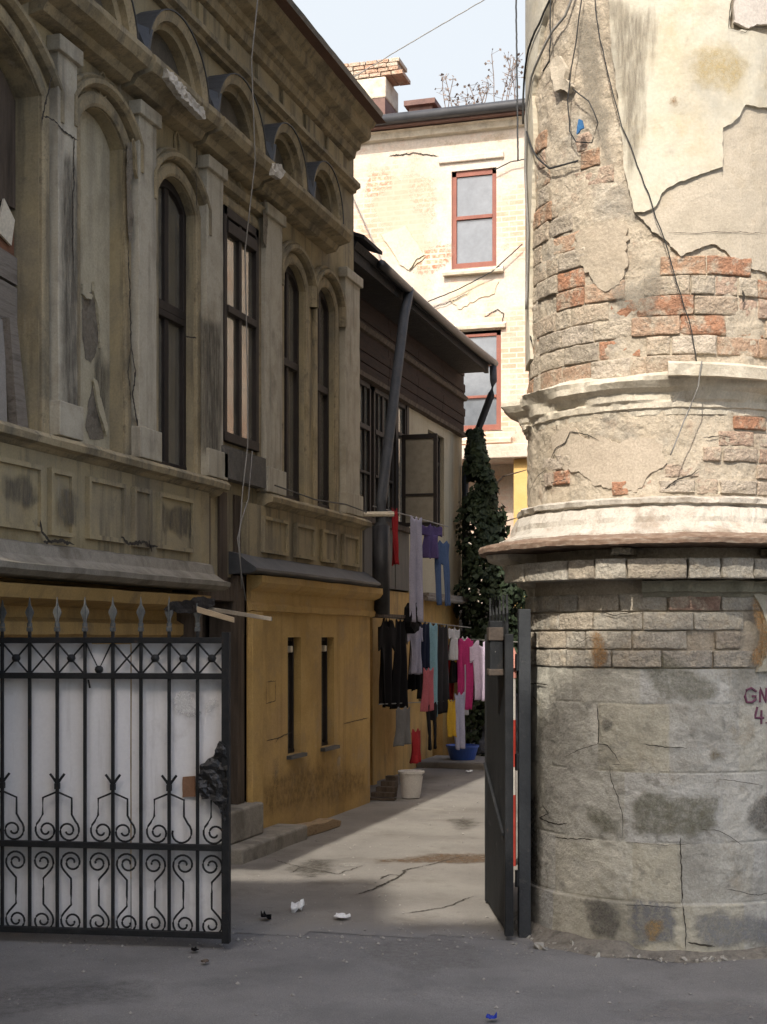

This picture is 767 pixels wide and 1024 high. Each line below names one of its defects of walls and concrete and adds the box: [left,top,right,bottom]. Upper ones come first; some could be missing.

spalling [162,68,206,120]
crack [42,76,76,271]
flaking render [525,0,767,394]
flaking render [81,282,103,363]
crack [127,250,138,426]
flaking render [85,378,108,440]
crack [531,432,599,488]
crack [665,468,700,489]
crack [564,708,740,947]
crack [275,855,468,894]
damp [584,900,619,937]
damp [632,900,675,943]